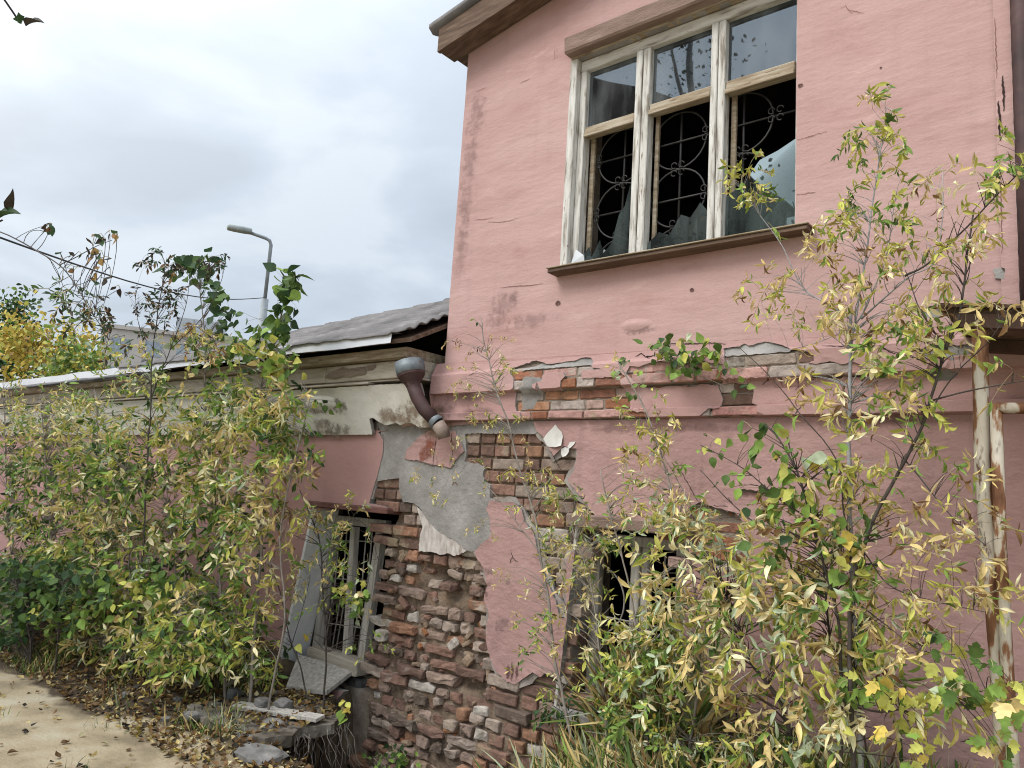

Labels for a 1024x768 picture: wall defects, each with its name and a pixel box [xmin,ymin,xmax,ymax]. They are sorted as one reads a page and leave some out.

crack [994,20,1006,141]
spalling [347,342,878,768]